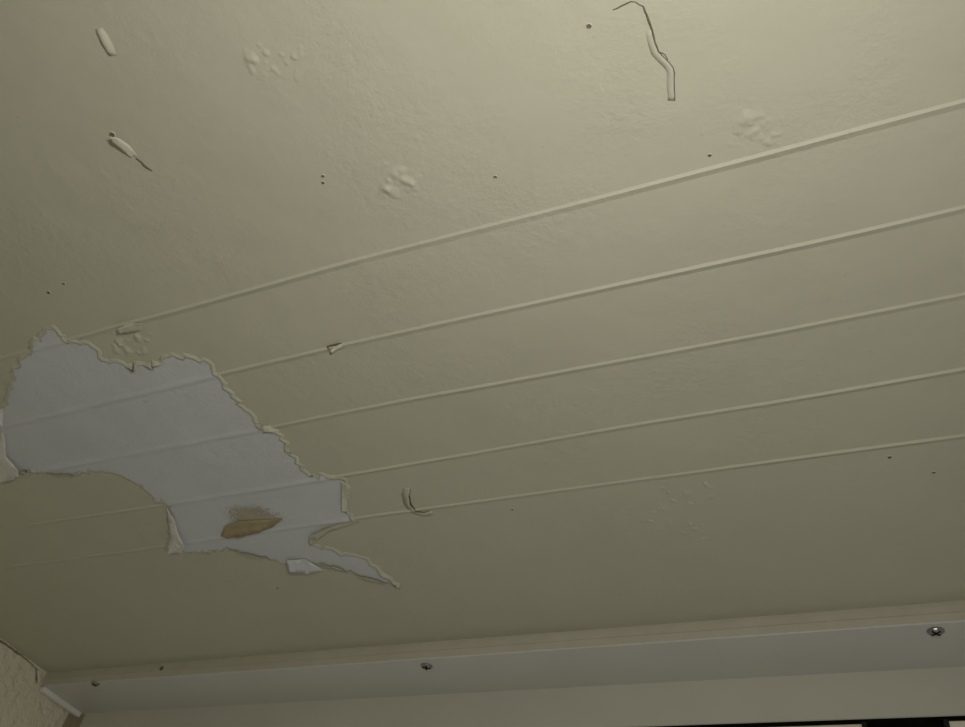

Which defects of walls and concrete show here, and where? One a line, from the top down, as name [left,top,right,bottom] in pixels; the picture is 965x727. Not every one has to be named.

crack [613,1,676,101]
peeling [108,131,152,171]
peeling [0,325,401,589]